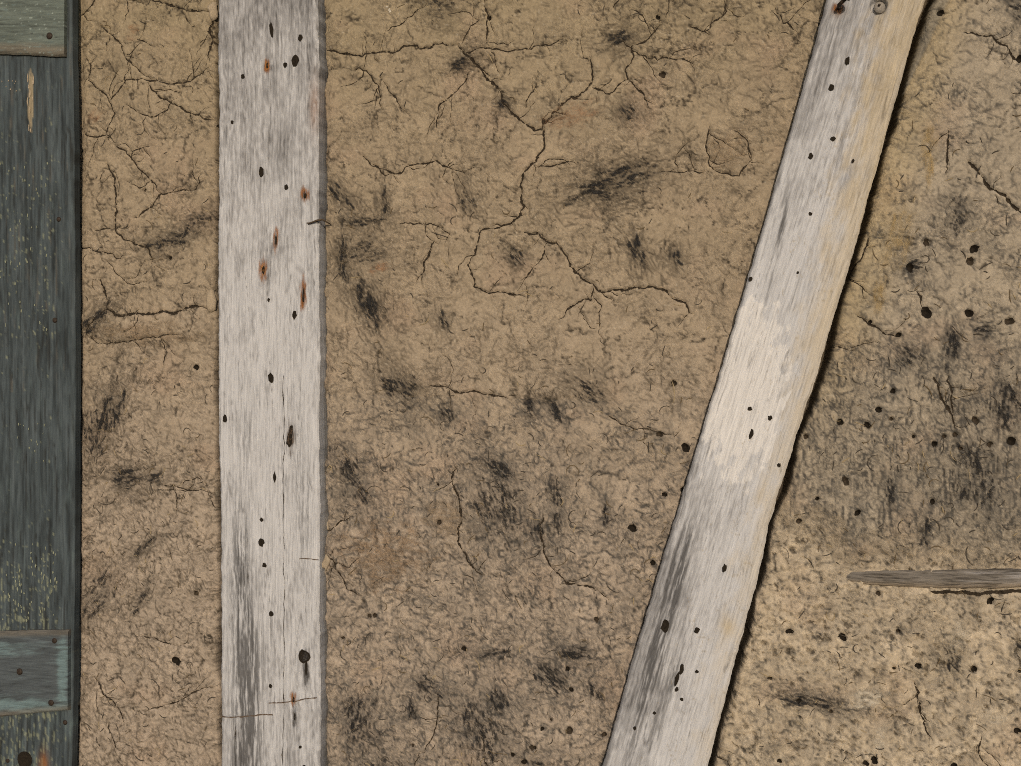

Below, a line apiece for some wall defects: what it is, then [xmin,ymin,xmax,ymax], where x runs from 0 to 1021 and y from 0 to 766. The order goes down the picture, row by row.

crack [775,0,810,32]
crack [965,32,1019,64]
crack [82,0,219,365]
crack [327,0,759,341]
crack [921,131,1021,213]
crack [430,356,514,416]
crack [609,416,681,448]
crack [432,469,491,597]
crack [523,518,609,600]